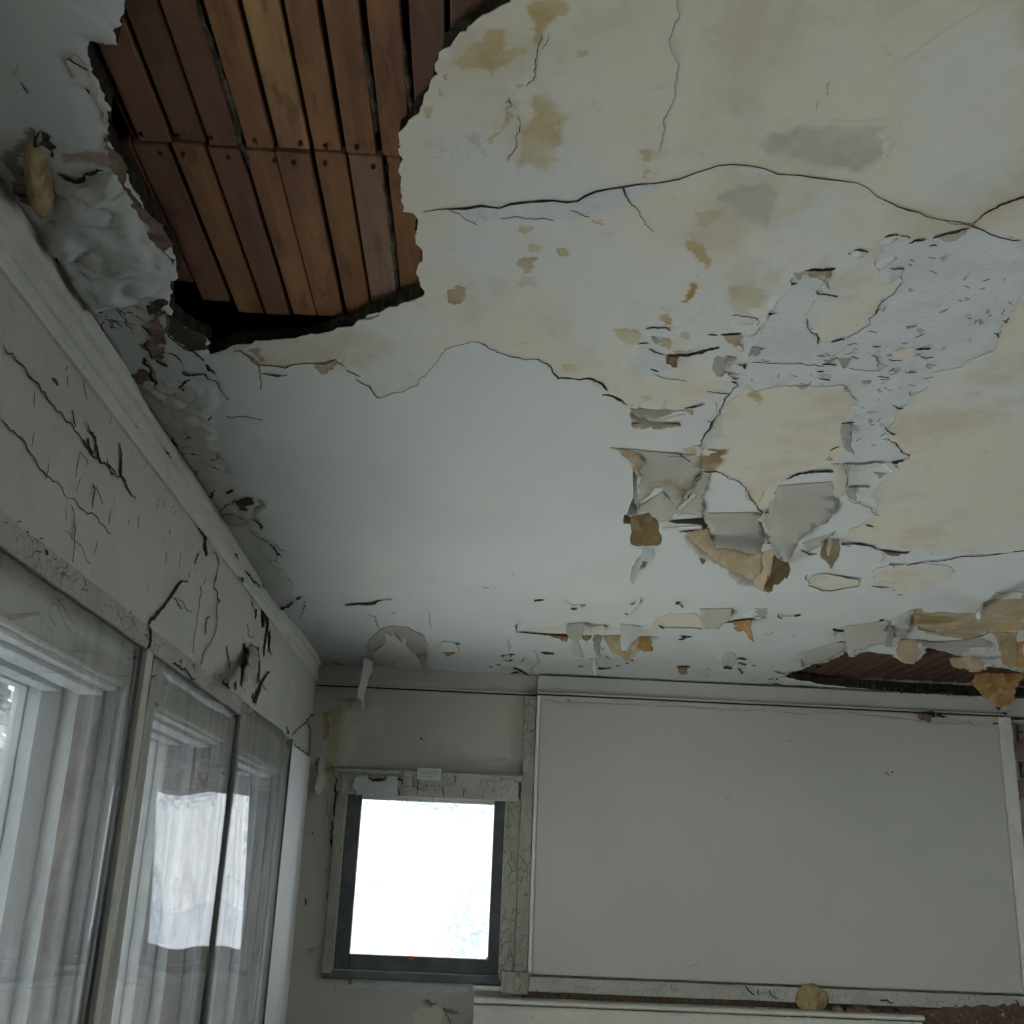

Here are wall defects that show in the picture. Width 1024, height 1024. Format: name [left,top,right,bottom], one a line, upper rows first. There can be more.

water stain [422,0,573,120]
water stain [425,82,575,177]
spalling [57,133,175,265]
crack [424,164,1024,241]
spalling [131,299,207,388]
crack [165,313,262,420]
crack [260,342,633,406]
peeling [739,228,1024,469]
crack [2,345,270,705]
crack [250,520,306,618]
peeling [721,652,756,674]
flaking render [910,589,1024,670]